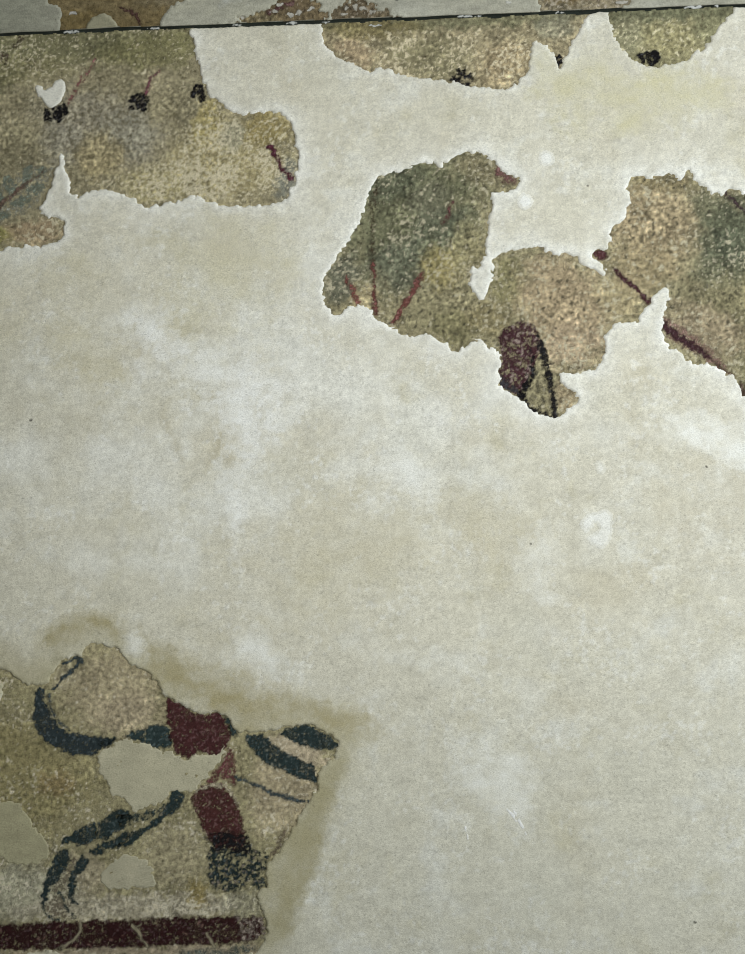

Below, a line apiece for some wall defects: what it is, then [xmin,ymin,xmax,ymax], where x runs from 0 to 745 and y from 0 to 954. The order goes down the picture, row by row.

leakage [0,201,568,954]